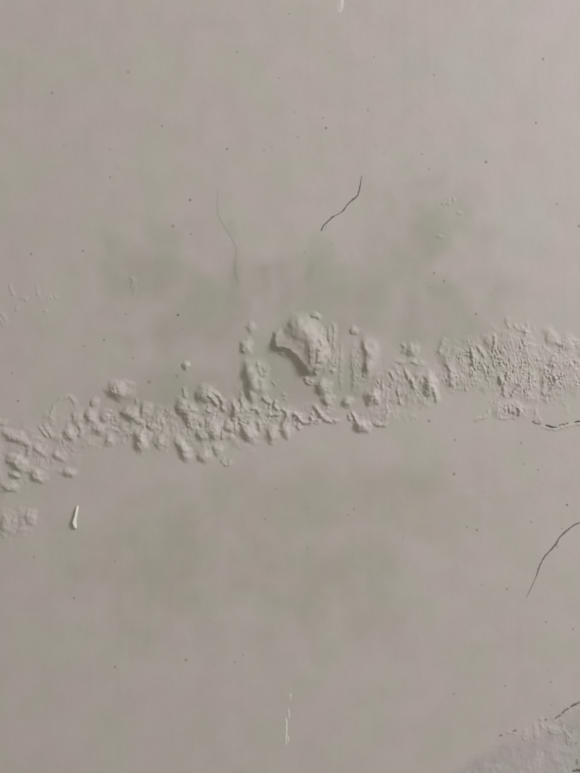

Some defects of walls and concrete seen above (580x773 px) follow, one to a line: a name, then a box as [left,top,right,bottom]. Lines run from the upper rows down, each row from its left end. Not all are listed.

crack [321,176,362,232]
crack [526,522,580,597]